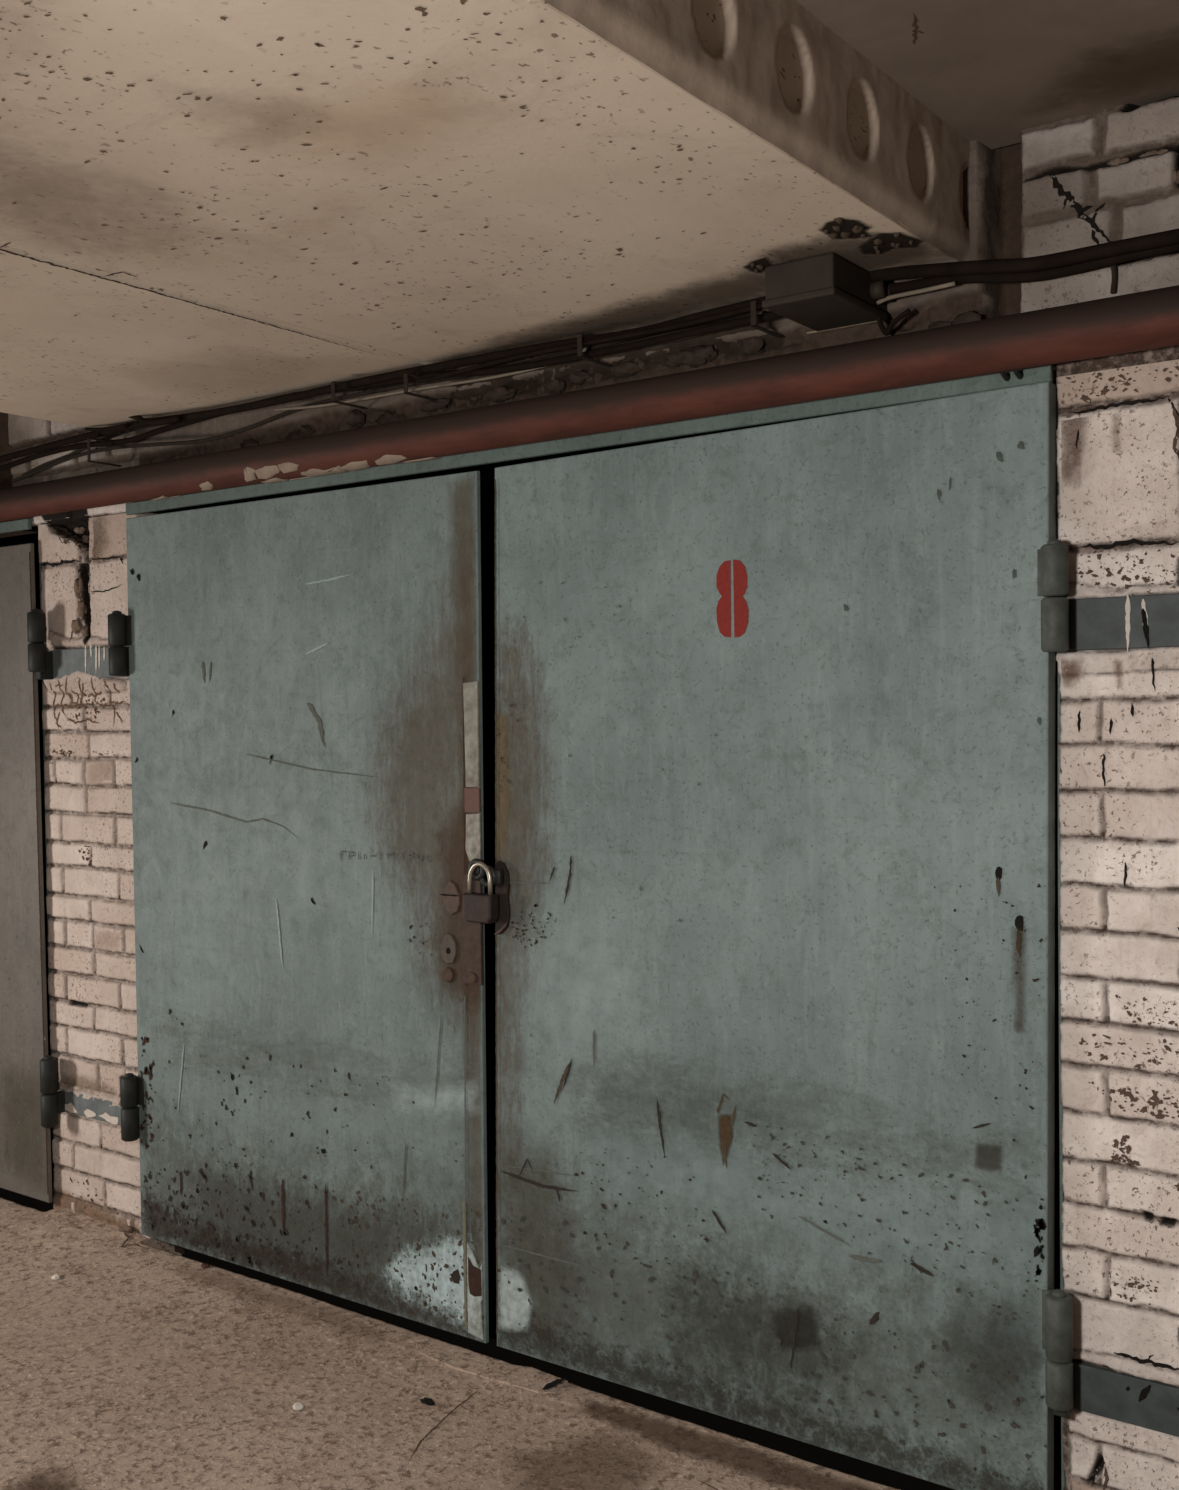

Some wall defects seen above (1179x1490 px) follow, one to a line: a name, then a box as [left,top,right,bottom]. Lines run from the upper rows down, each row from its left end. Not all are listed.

peeling [244,455,439,483]